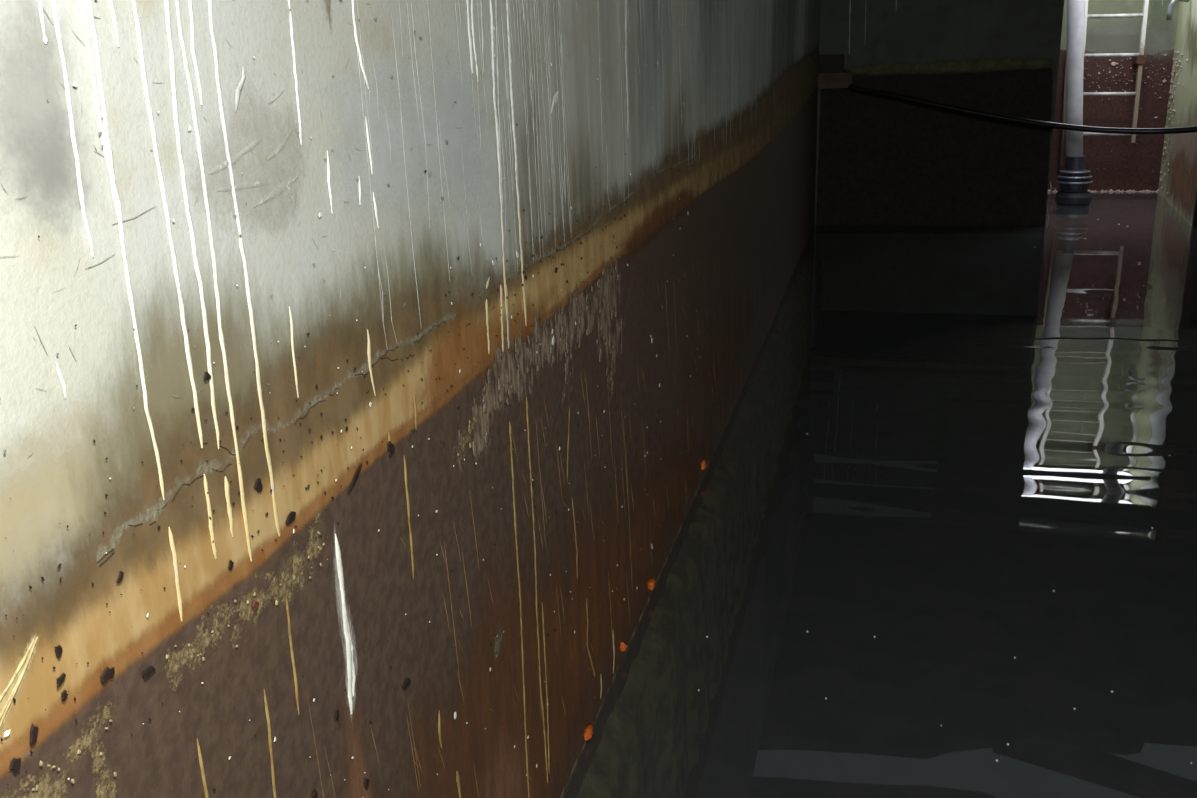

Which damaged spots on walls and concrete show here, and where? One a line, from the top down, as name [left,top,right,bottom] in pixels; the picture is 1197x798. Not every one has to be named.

damp [455,0,591,267]
crack [96,314,456,566]
corrosion [0,49,819,776]
damp [0,86,1066,798]
corrosion [347,711,386,798]